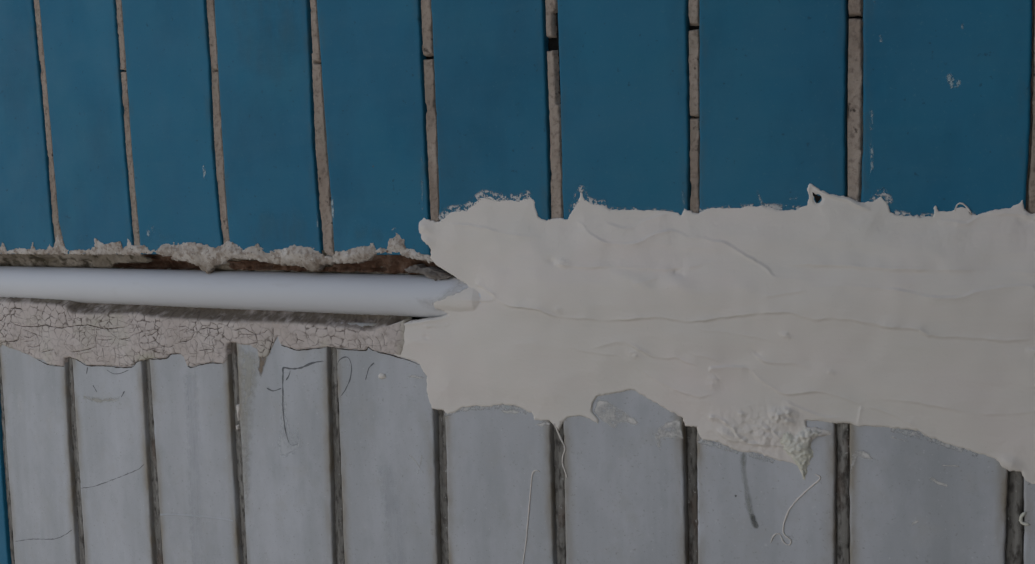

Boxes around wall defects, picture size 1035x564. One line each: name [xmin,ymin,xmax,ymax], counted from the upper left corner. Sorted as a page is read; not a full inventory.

spalling [0,232,454,281]
crack [0,308,386,365]
flaking render [0,297,413,367]